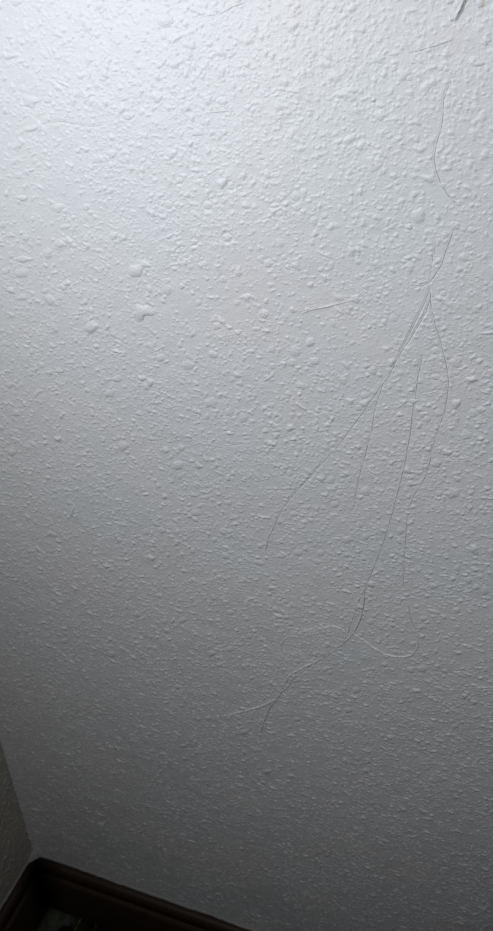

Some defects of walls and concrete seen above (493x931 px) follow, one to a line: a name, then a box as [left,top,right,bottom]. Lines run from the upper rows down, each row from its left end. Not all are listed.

crack [433,76,456,203]
crack [227,231,453,732]